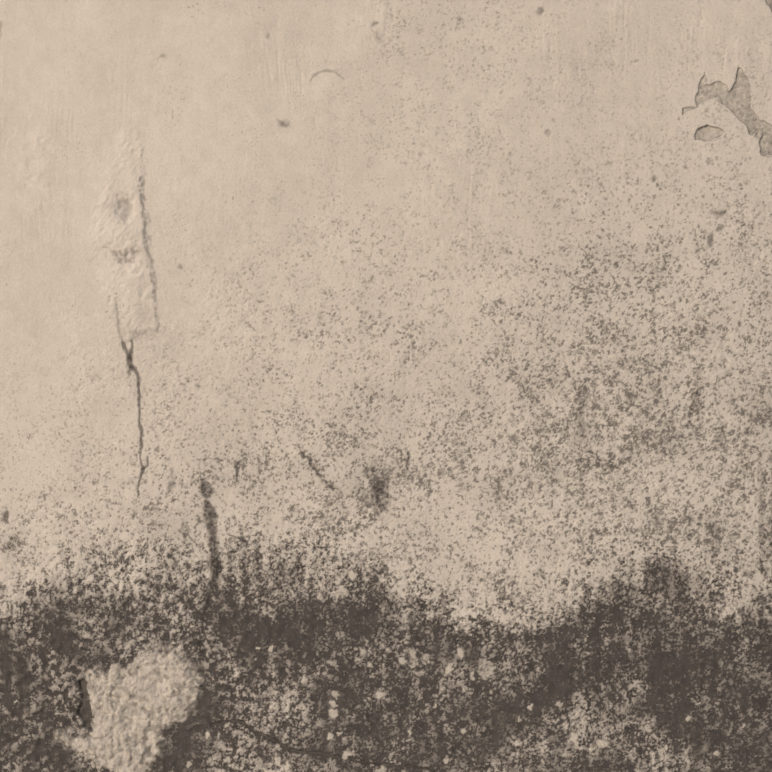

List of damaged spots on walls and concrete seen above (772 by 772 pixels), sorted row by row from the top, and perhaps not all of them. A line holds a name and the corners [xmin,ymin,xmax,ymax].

spalling [683,68,772,156]
leakage [0,479,772,772]
crack [210,719,436,772]